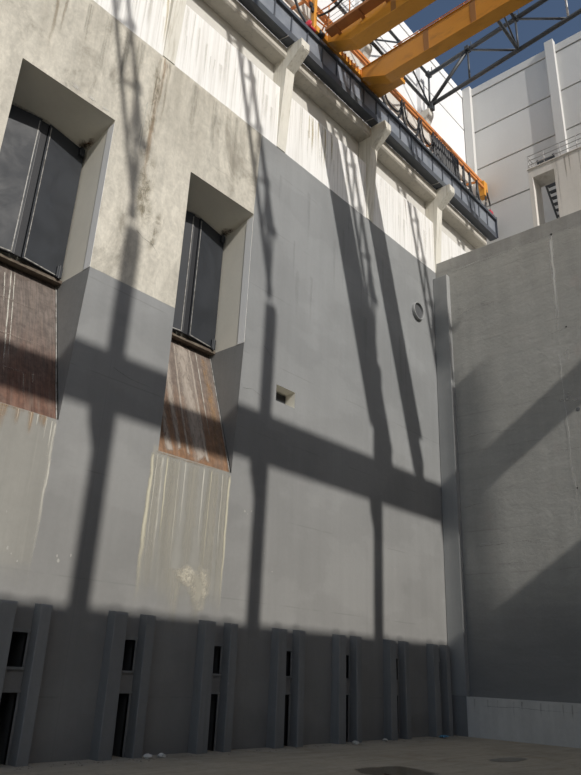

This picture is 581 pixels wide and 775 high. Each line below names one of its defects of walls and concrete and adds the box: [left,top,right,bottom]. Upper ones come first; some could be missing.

water stain [139,343,231,574]